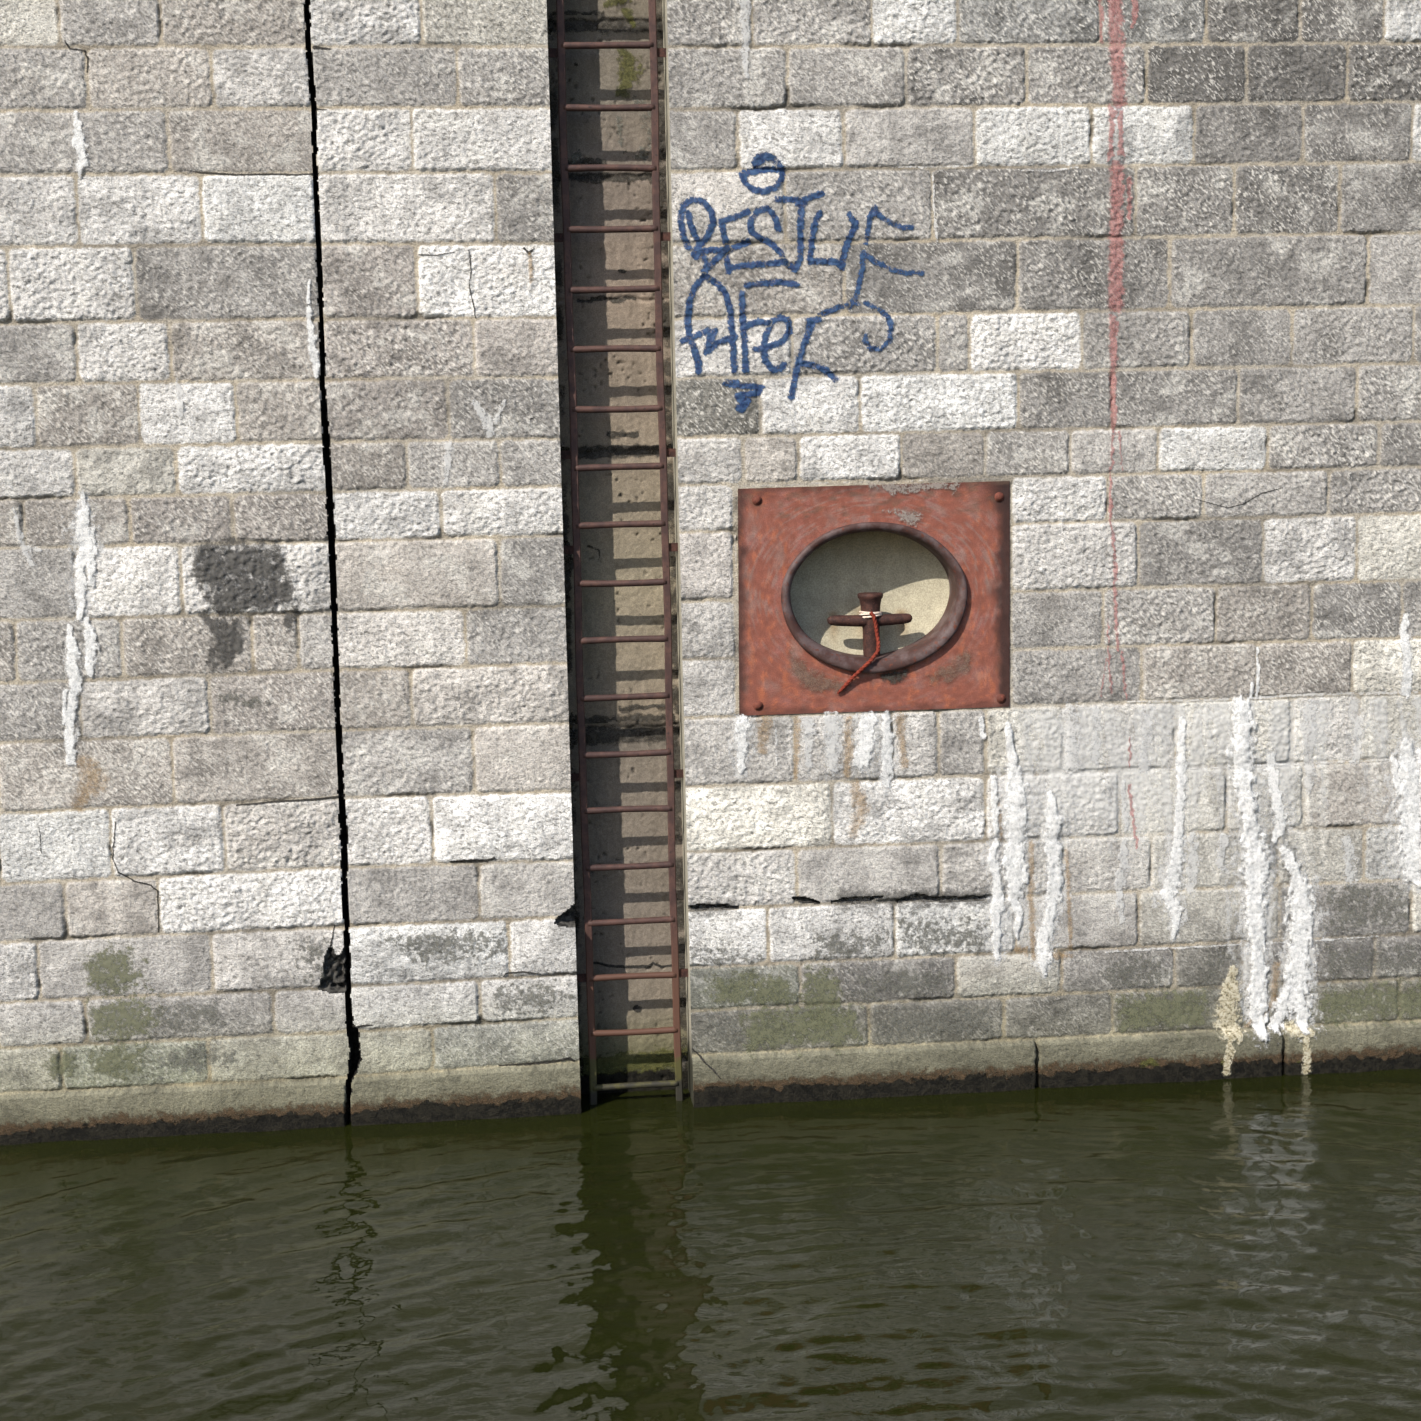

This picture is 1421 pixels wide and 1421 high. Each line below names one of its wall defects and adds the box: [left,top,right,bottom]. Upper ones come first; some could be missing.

damp [61,490,106,765]
crack [193,0,373,1107]
spalling [318,944,349,994]
damp [549,80,682,837]
damp [676,103,1421,1108]